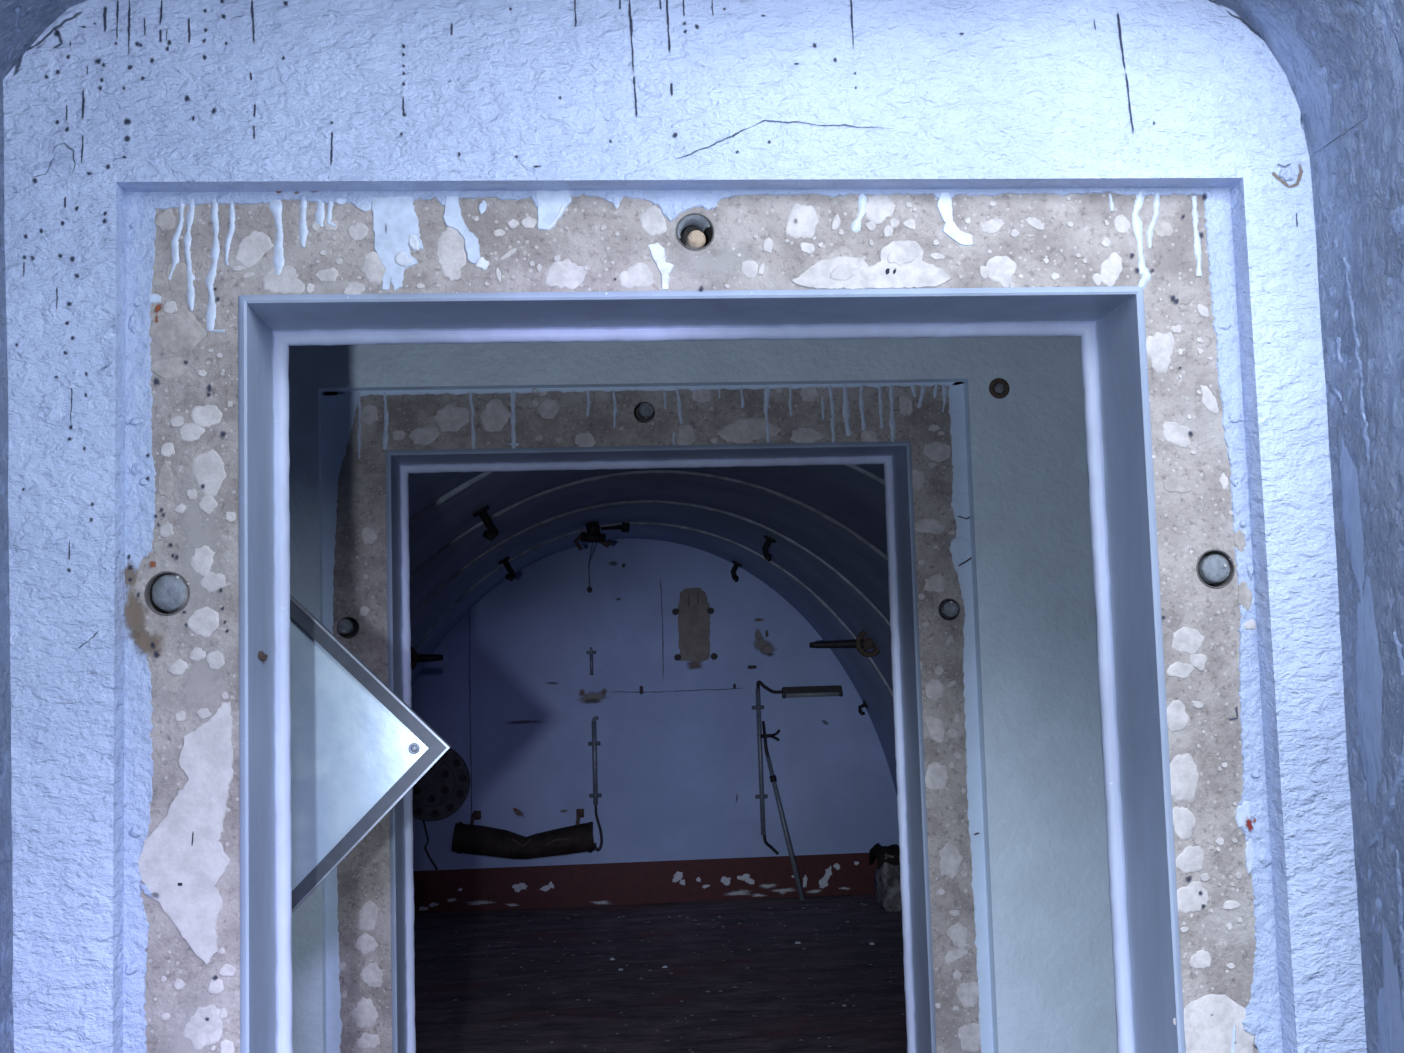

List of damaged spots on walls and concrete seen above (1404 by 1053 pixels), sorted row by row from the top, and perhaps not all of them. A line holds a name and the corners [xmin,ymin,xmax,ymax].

crack [680,120,875,158]
water stain [299,198,336,247]
water stain [1131,191,1160,272]
water stain [1182,194,1207,276]
water stain [184,199,235,333]
water stain [508,390,519,449]
water stain [828,384,895,443]